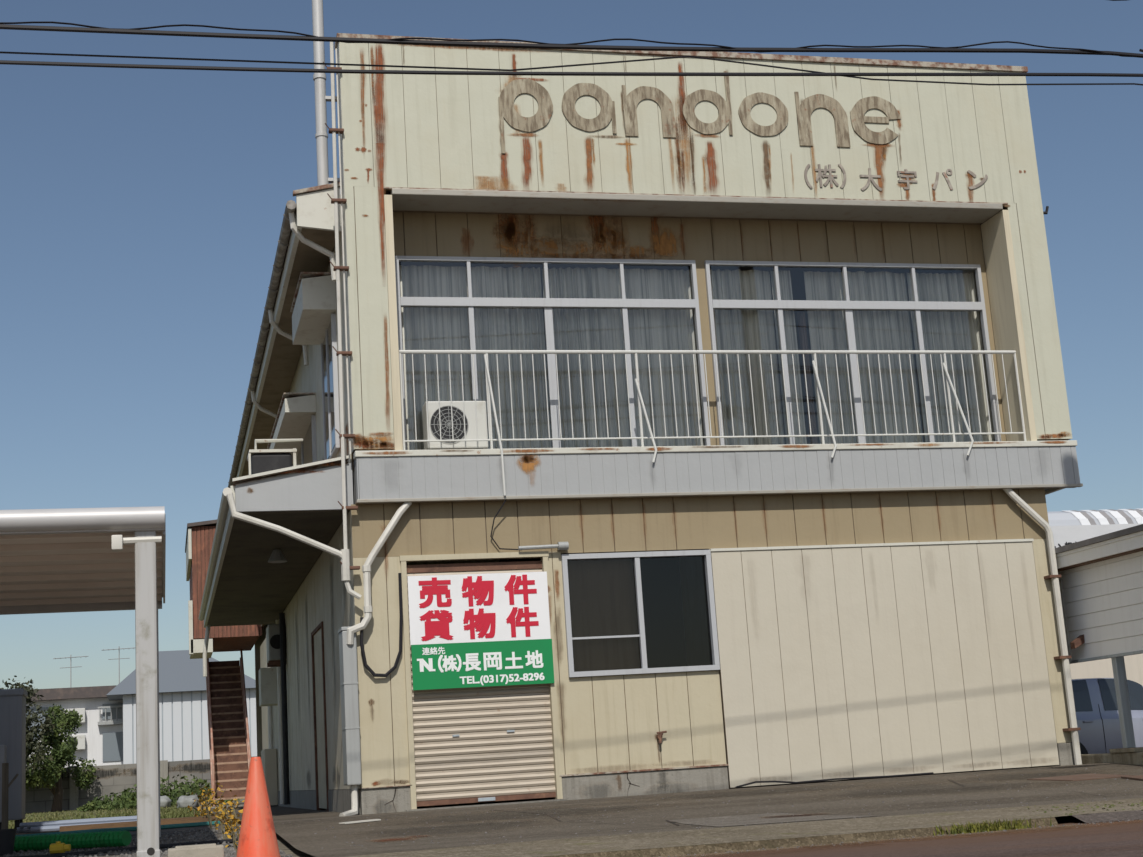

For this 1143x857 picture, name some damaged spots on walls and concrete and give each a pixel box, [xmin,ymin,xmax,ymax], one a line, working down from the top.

corrosion [415,45,544,83]
corrosion [639,54,717,189]
corrosion [345,46,385,267]
corrosion [479,153,508,190]
corrosion [516,133,543,184]
corrosion [584,135,633,200]
corrosion [763,142,771,188]
corrosion [867,111,901,194]
corrosion [496,214,684,259]
corrosion [283,425,405,473]
corrosion [511,449,553,473]